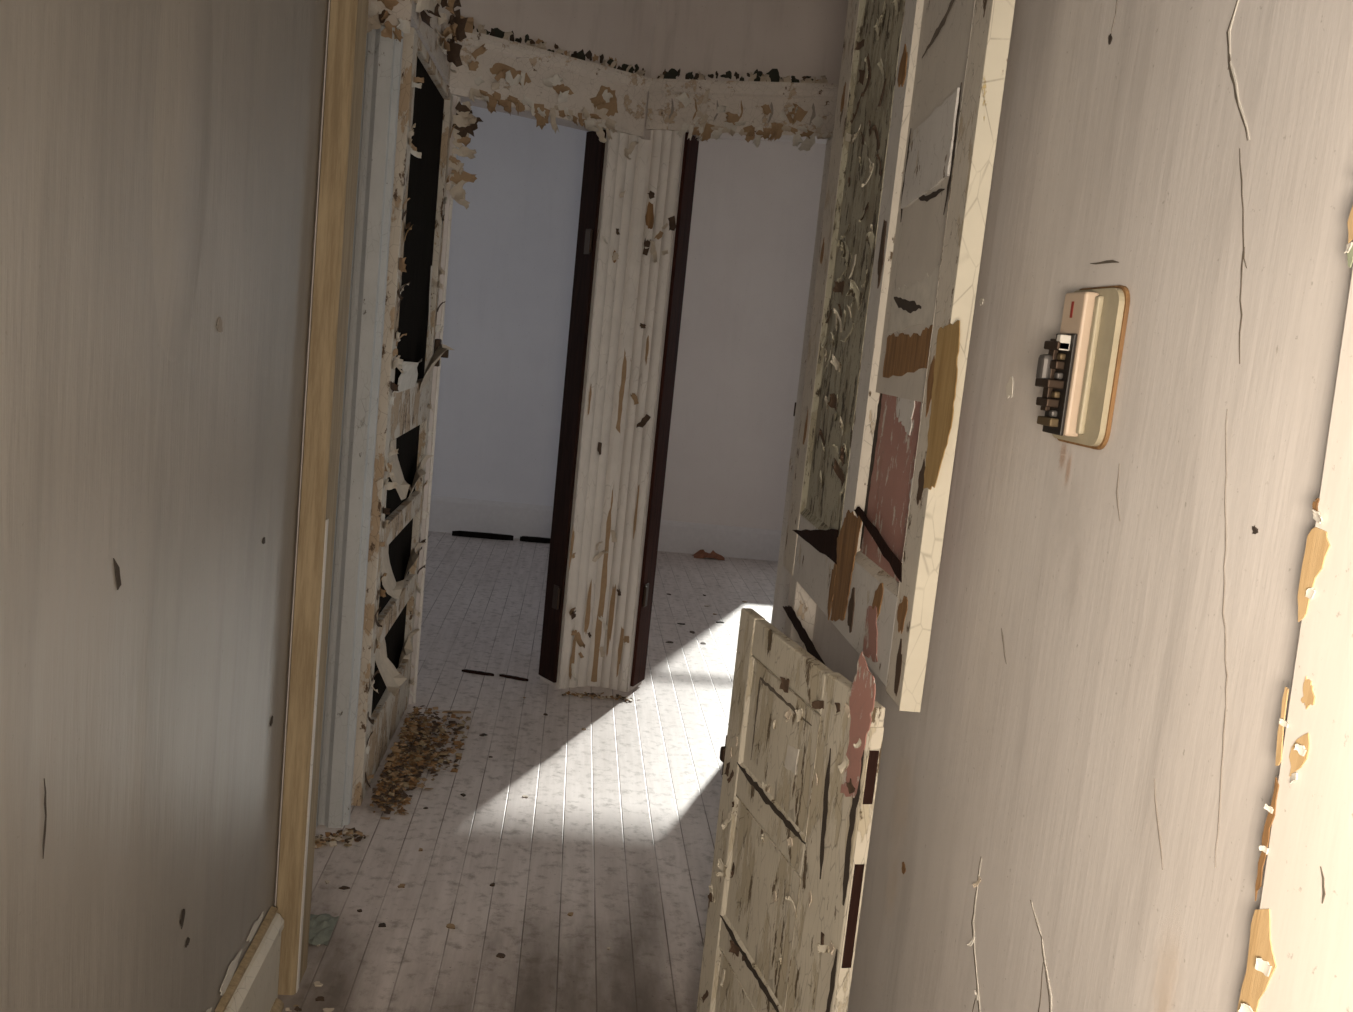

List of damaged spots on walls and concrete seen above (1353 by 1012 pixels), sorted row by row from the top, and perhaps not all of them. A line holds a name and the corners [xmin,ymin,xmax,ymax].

peeling [367,0,908,372]
peeling [616,350,651,433]
peeling [569,486,629,682]